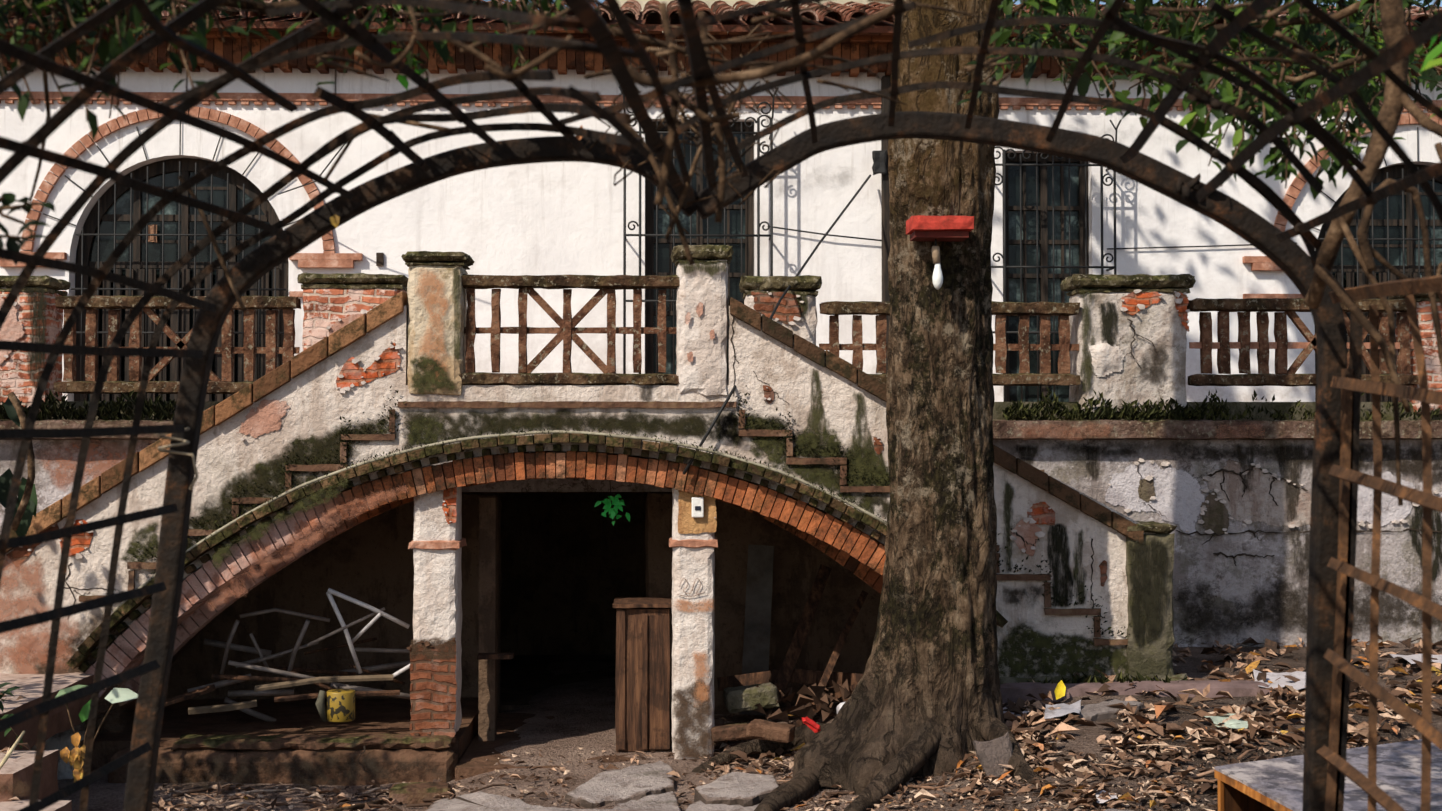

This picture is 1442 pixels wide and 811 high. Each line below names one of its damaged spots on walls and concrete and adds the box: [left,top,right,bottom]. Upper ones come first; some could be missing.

peeling [0,295,25,364]
spalling [336,341,403,394]
water stain [403,268,743,450]
crack [1120,319,1159,369]
spalling [1120,289,1190,332]
spalling [1009,502,1055,556]
water stain [1047,524,1074,607]
water stain [1059,443,1136,479]
peeling [1105,458,1311,537]
water stain [1128,443,1313,646]
water stain [1352,503,1442,635]
water stain [1359,444,1442,484]